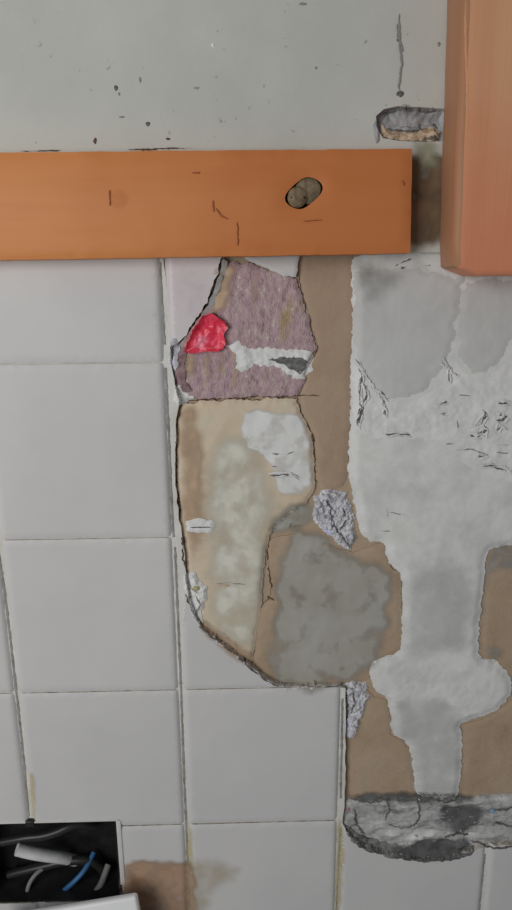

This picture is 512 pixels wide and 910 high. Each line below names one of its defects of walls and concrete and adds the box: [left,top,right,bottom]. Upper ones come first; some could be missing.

flaking render [373,104,444,143]
peeling [179,259,229,354]
crack [355,360,411,438]
crack [439,357,512,476]
crack [175,395,345,688]
peeling [243,253,512,863]